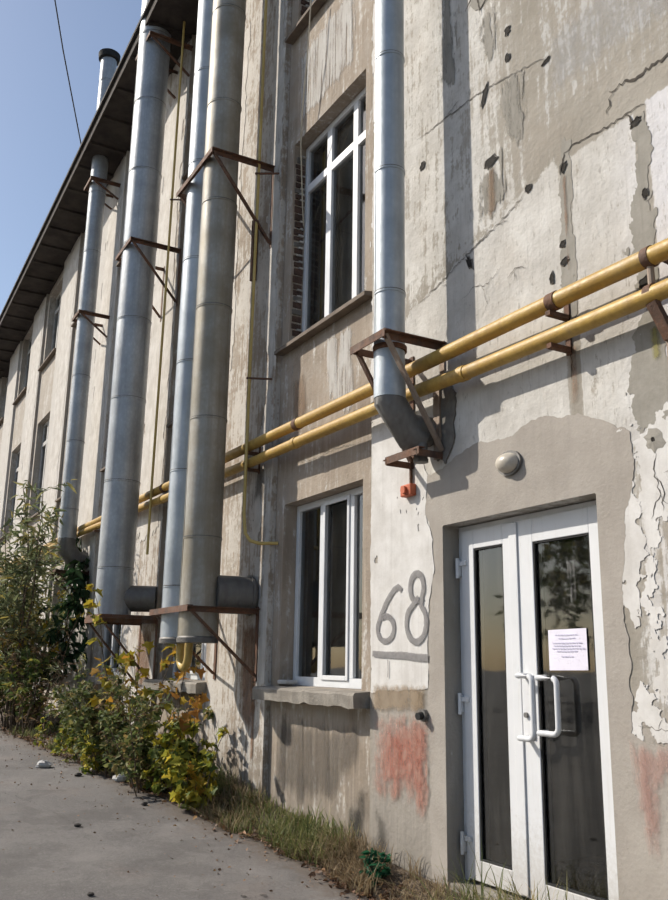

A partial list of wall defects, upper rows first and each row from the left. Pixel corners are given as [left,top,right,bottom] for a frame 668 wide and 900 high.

crack [417,56,547,140]
crack [559,52,668,173]
flaking render [623,111,658,256]
crack [418,197,526,310]
flaking render [634,266,659,292]
flaking render [617,308,668,744]
crack [652,452,667,517]